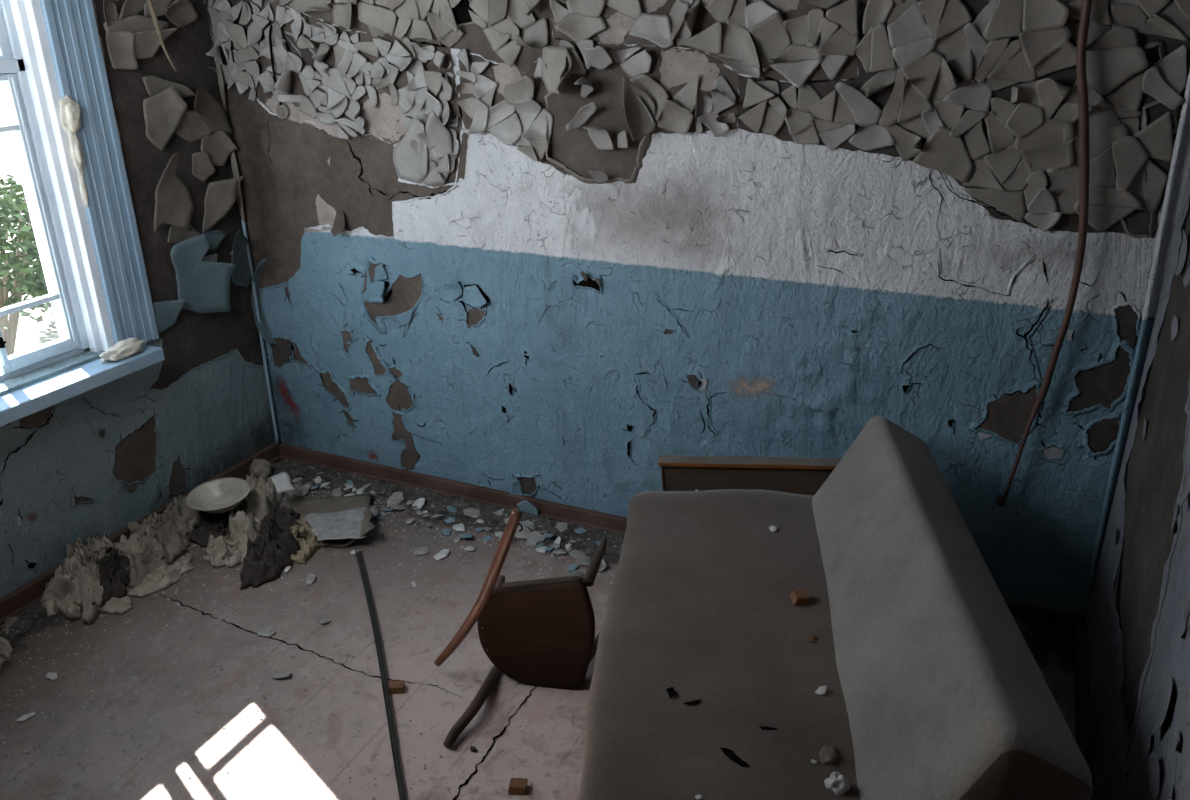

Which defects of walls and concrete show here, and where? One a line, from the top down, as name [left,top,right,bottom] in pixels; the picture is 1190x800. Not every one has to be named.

peeling [92,0,1190,471]
crack [819,249,863,275]
crack [882,155,1088,384]
peeling [0,405,55,441]
peeling [94,412,190,496]
peeling [511,474,542,498]
peeling [946,195,1190,800]
peeling [433,549,449,561]
crack [452,686,536,800]